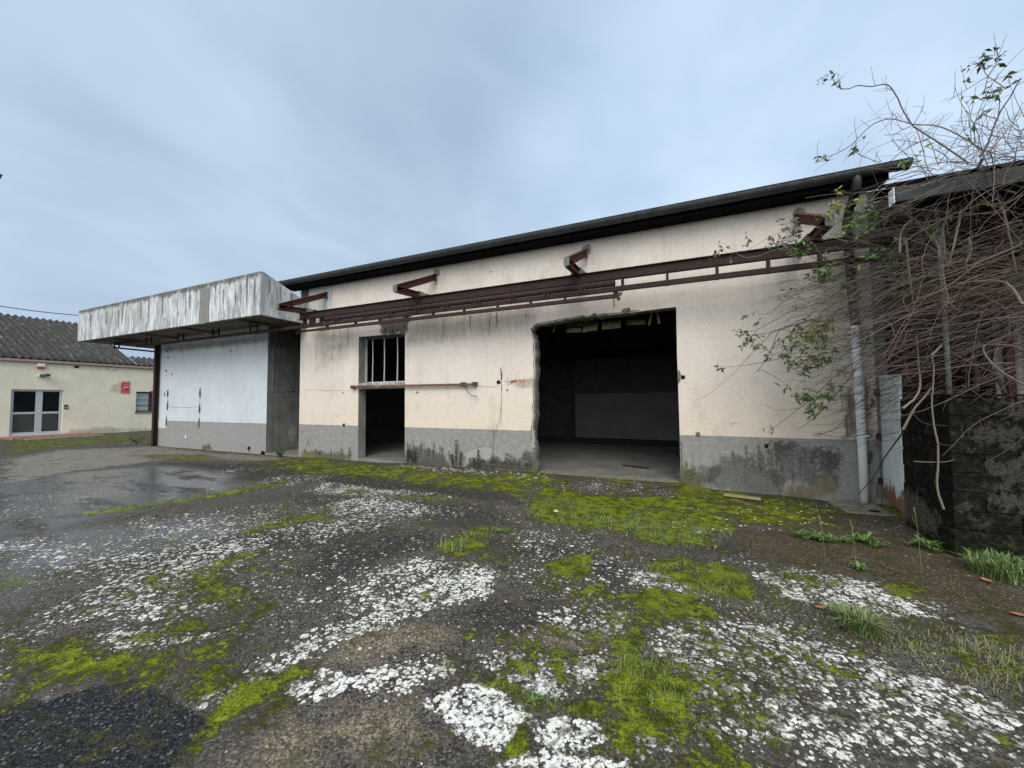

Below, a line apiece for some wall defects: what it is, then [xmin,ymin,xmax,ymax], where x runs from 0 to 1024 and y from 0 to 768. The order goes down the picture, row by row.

leakage [80,272,257,326]